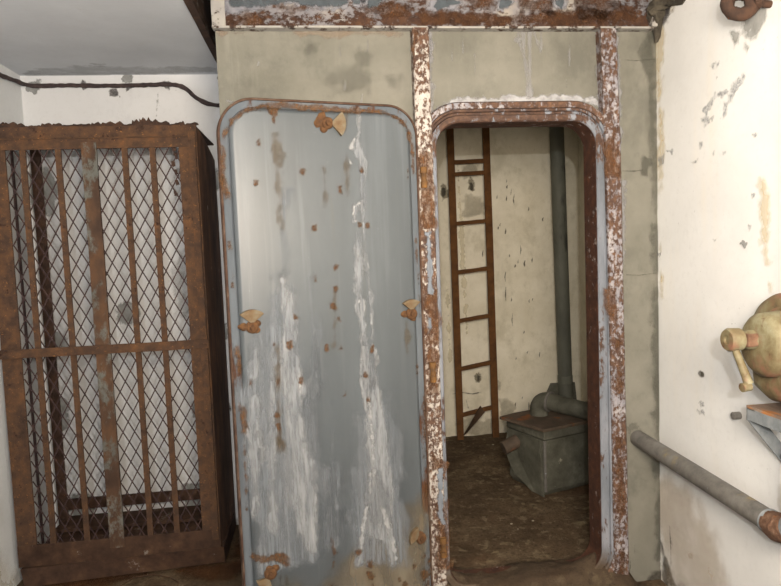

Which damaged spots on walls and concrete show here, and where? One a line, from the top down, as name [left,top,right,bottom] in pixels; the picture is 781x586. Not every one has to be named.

corrosion [227,13,264,26]
corrosion [364,0,638,51]
spalling [646,0,686,43]
leakage [447,32,598,106]
corrosion [602,130,621,178]
corrosion [418,152,438,229]
corrosion [603,289,617,317]
corrosion [424,290,442,393]
corrosion [616,364,624,394]
corrosion [616,460,627,515]